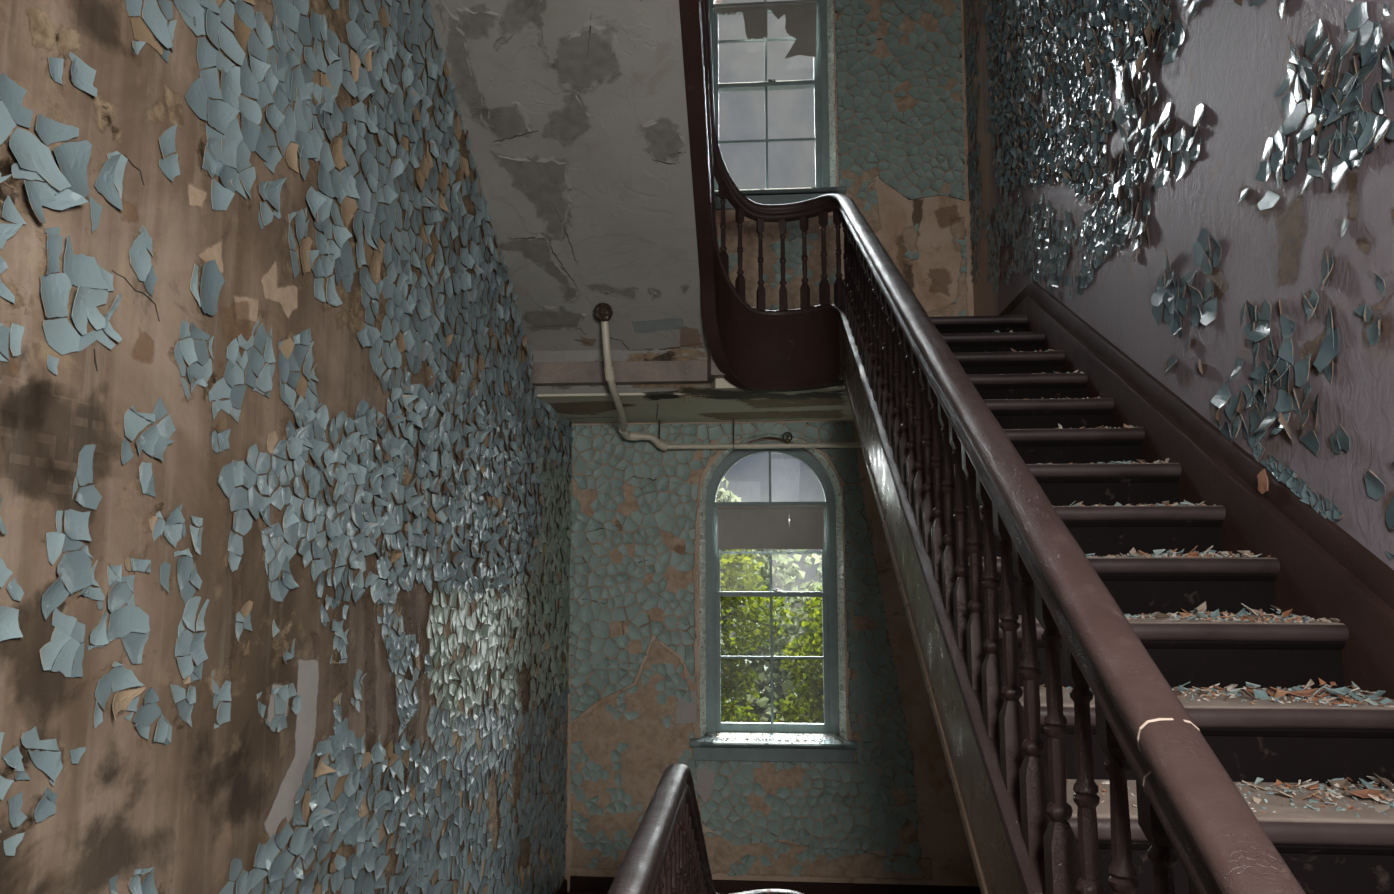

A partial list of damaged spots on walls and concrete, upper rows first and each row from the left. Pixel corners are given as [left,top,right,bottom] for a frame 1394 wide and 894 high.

peeling [0,9,128,375]
peeling [835,0,1222,377]
peeling [1234,0,1394,218]
peeling [1210,216,1350,521]
peeling [1354,304,1392,346]
peeling [0,558,24,641]
peeling [40,397,232,745]
peeling [1364,470,1394,530]
peeling [0,726,86,856]
peeling [109,867,162,894]